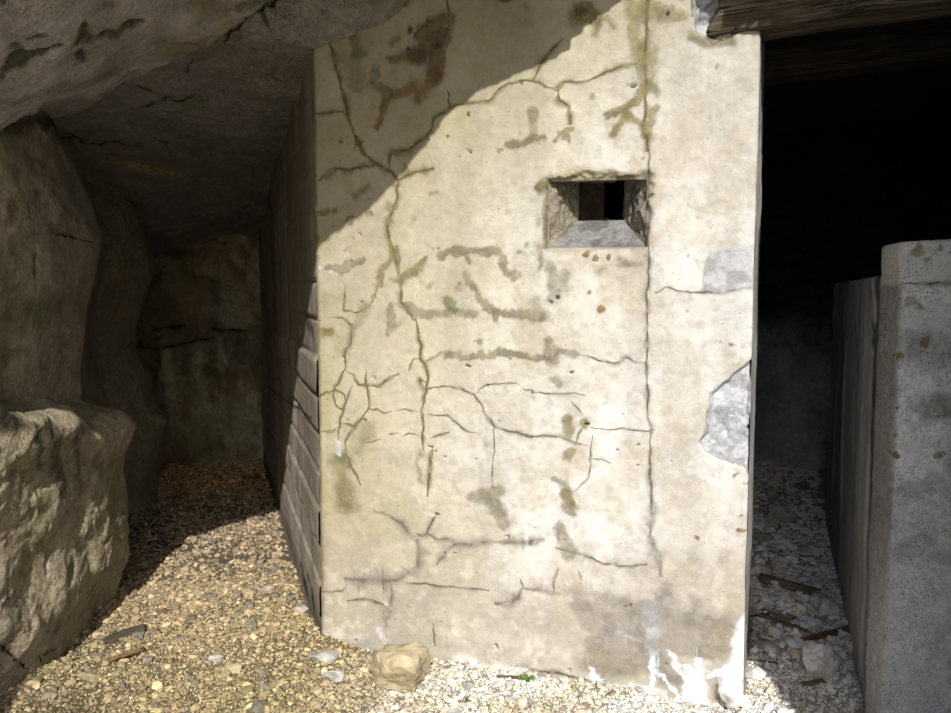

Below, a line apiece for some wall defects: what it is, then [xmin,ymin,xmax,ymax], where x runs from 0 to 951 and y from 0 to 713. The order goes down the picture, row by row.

flaking render [690,0,736,45]
crack [264,0,713,619]
peeling [704,246,753,293]
flaking render [701,364,751,472]
damp [575,591,745,705]